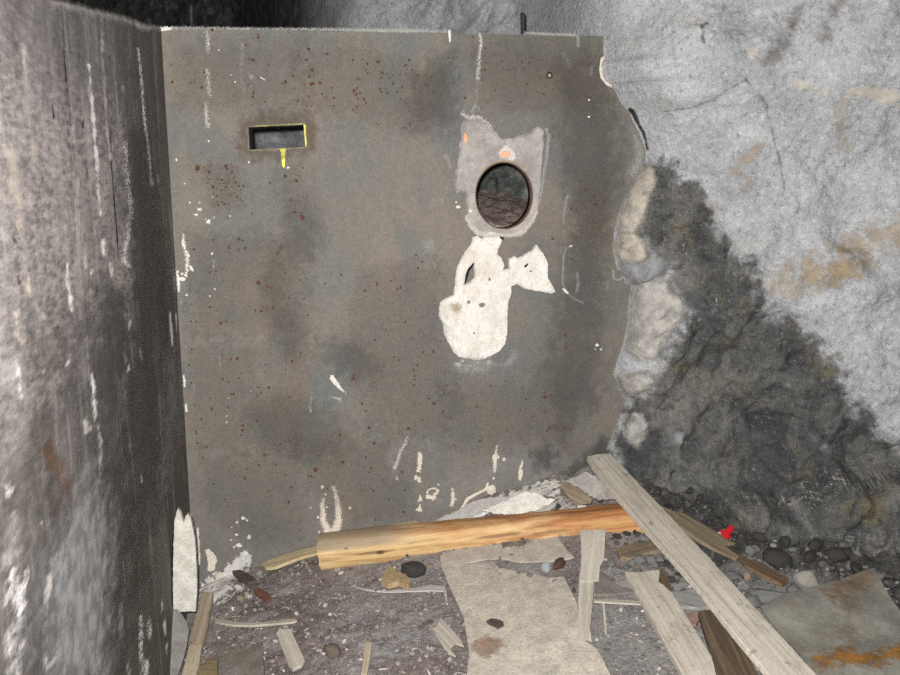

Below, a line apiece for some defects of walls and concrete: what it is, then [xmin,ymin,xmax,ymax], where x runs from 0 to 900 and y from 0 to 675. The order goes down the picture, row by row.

corrosion [195,163,244,207]
spalling [438,111,555,373]
water stain [571,158,900,555]
peeling [205,549,217,572]